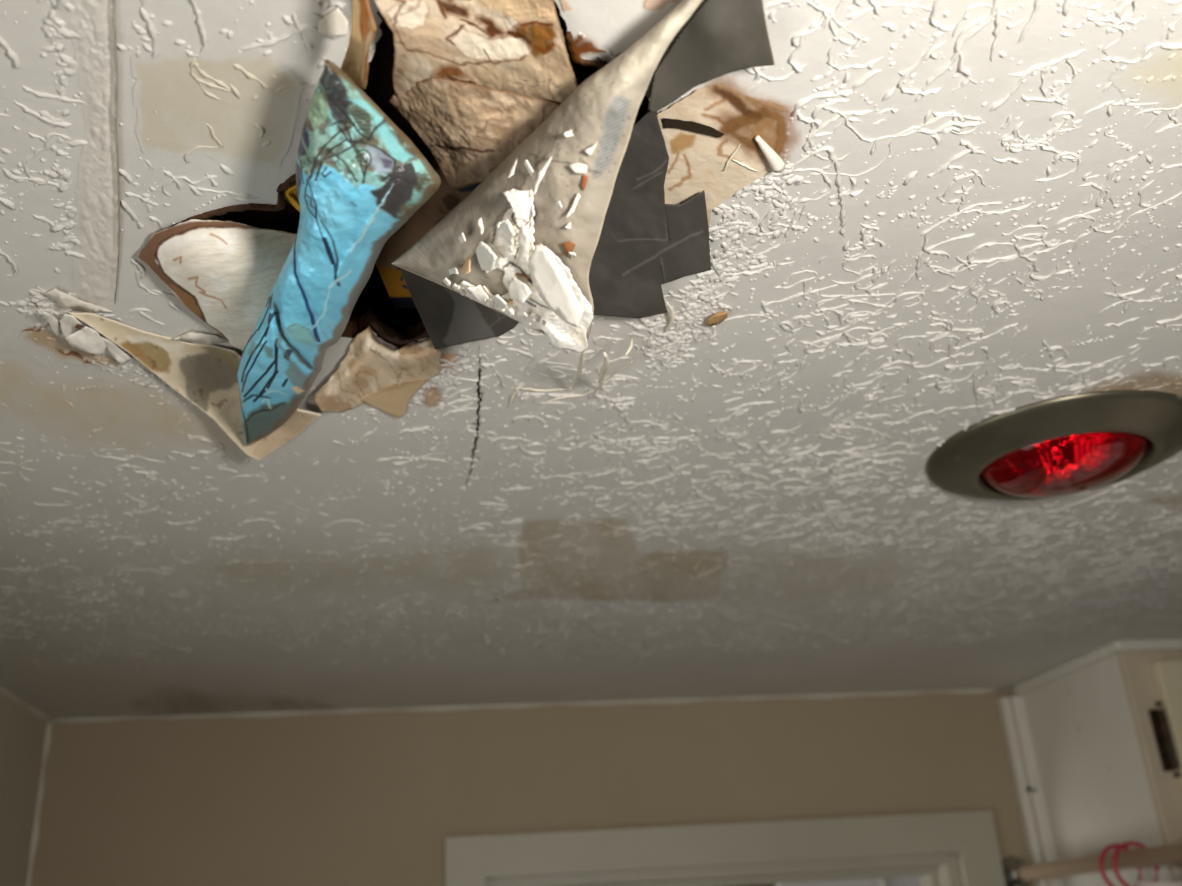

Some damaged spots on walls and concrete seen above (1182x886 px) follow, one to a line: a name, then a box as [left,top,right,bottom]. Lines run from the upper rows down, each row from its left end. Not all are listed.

peeling [43,0,786,460]
crack [466,349,484,488]
water stain [188,515,911,612]